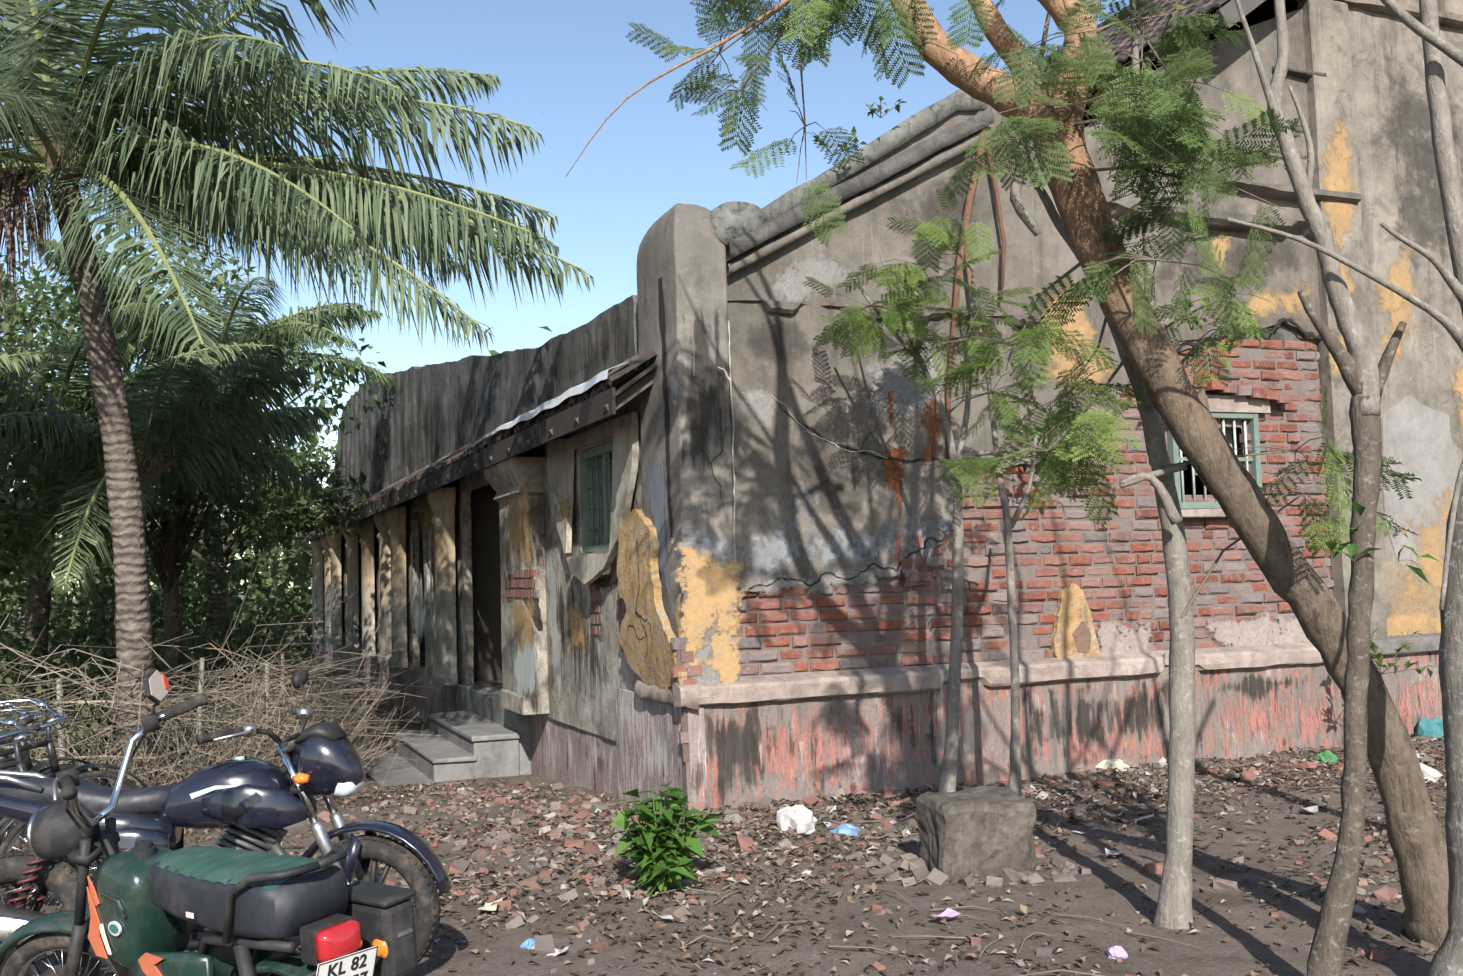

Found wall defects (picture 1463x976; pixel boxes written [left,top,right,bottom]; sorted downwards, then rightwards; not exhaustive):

crack [658,277,736,564]
leakage [681,314,729,465]
leakage [749,323,805,361]
crack [770,394,949,501]
peeling [1043,283,1113,393]
spalling [1175,286,1347,596]
leakage [650,458,953,595]
spalling [670,381,1170,686]
spalling [1159,415,1297,648]
peeling [1384,488,1453,636]
leakage [708,705,769,804]
leakage [1021,682,1169,758]